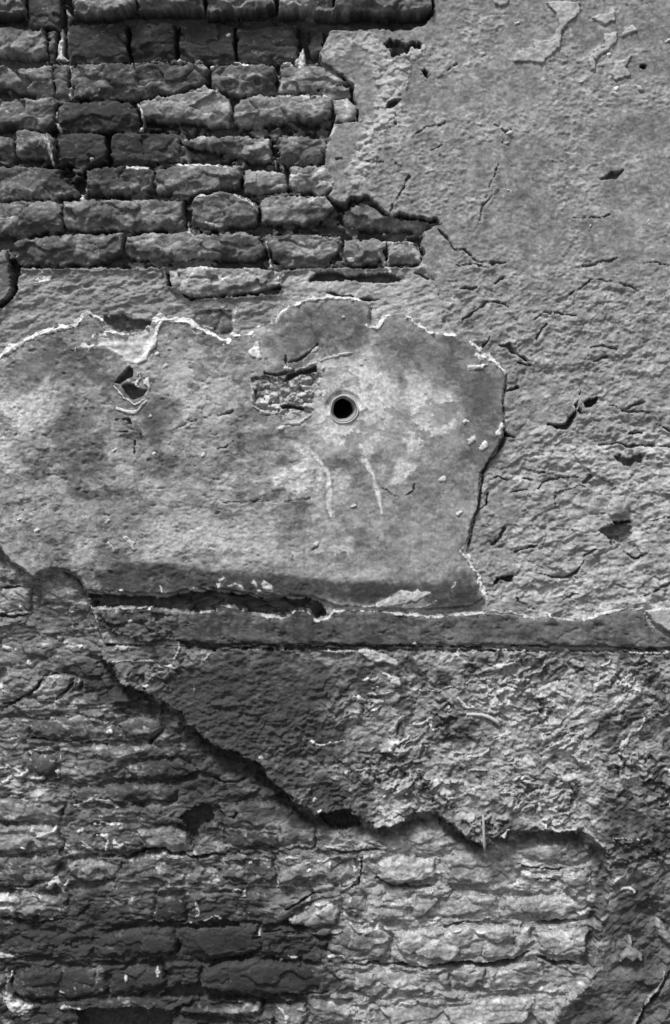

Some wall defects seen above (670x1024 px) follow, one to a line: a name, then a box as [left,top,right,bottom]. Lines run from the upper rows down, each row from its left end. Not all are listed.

peeling [512,1,646,93]
spalling [0,0,443,337]
crack [438,125,512,322]
crack [535,258,670,341]
damp [0,377,57,474]
damp [163,354,237,431]
spalling [249,347,354,426]
damp [272,341,459,517]
crack [598,401,670,449]
crack [467,374,599,602]
damp [95,520,476,608]
spalling [0,548,637,1024]